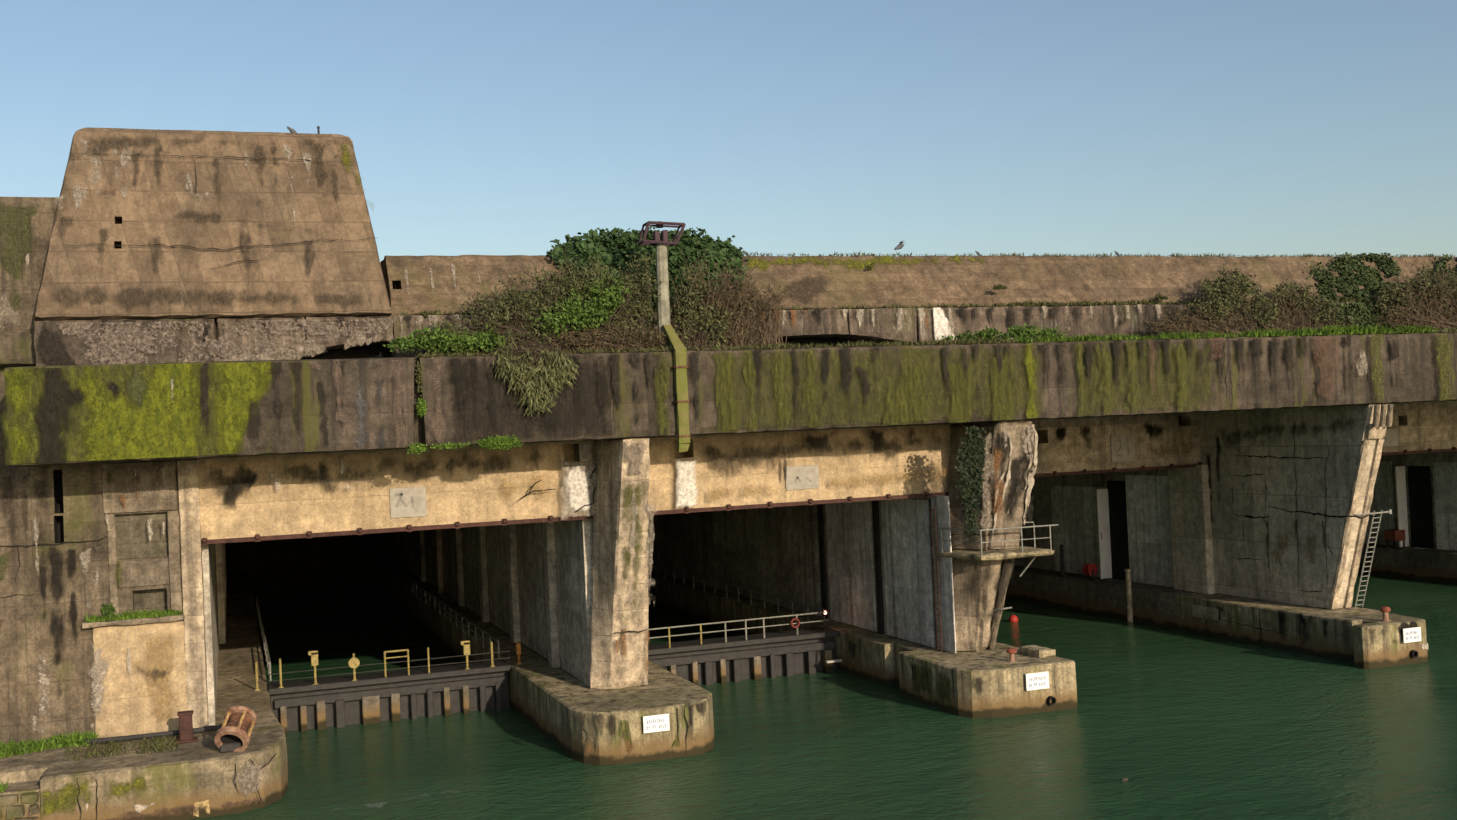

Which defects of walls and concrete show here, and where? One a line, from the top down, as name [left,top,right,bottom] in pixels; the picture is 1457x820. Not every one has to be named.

water stain [57,138,178,230]
water stain [178,159,220,222]
water stain [244,141,338,199]
water stain [305,240,315,274]
water stain [1345,334,1399,401]
water stain [1436,333,1455,400]
water stain [208,352,664,506]
water stain [691,346,945,499]
water stain [942,304,1322,535]
crack [1206,340,1376,645]